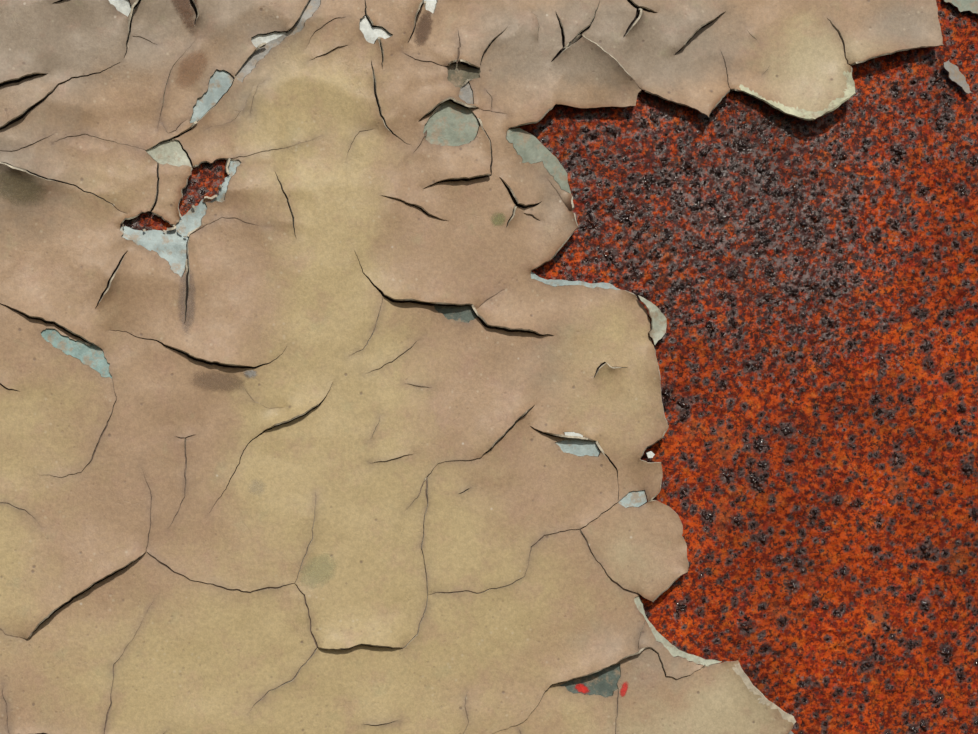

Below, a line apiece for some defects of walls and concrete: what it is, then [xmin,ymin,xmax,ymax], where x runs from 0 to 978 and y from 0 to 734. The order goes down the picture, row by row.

peeling [146,140,192,167]
corrosion [114,154,237,237]
peeling [120,160,241,278]
crack [0,0,772,384]
peeling [423,63,480,146]
peeling [506,0,978,196]
peeling [41,329,112,379]
corrosion [506,0,978,734]
crack [0,235,641,734]
peeling [525,210,796,734]
crack [449,618,709,734]